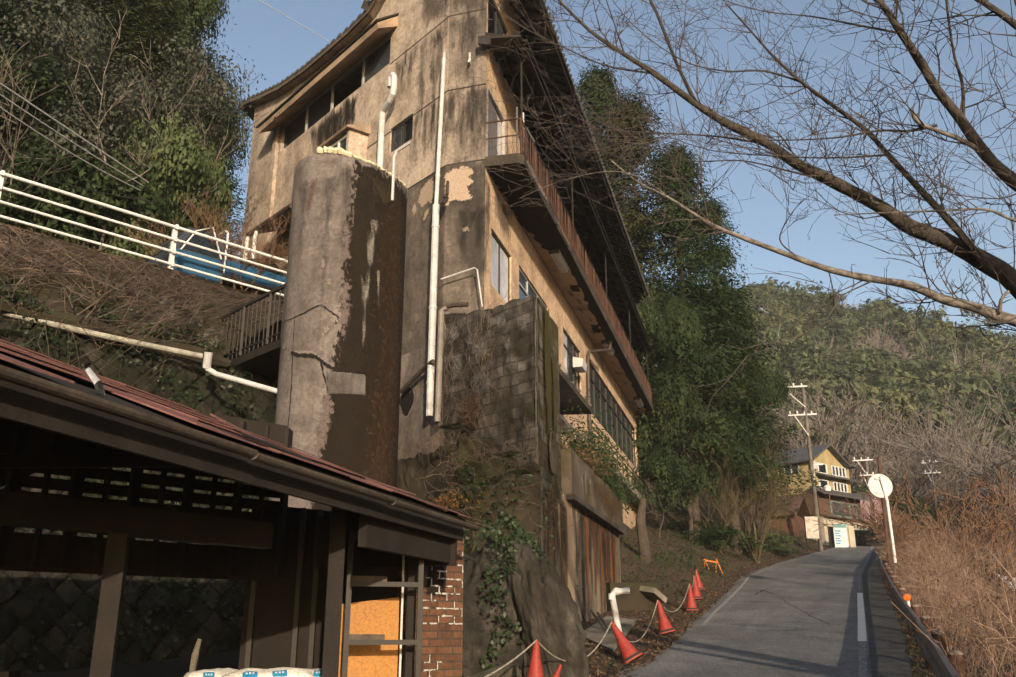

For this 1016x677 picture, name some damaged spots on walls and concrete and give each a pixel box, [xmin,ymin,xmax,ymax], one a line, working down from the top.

leakage [425,0,483,42]
leakage [401,57,486,134]
flaking render [412,166,476,221]
crack [283,304,341,424]